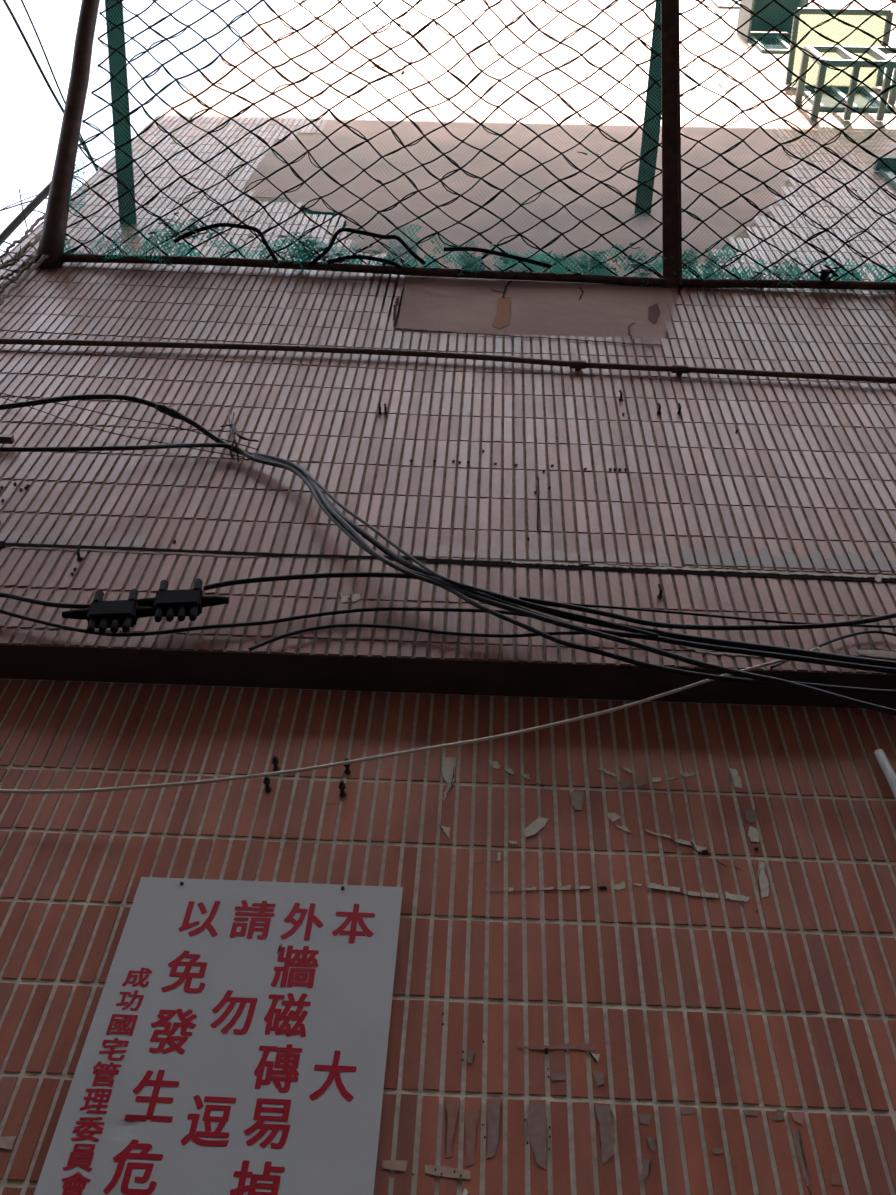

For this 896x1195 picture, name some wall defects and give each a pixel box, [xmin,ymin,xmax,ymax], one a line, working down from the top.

peeling [497,817,549,861]
peeling [607,812,706,852]
peeling [748,826,759,843]
peeling [614,861,769,912]